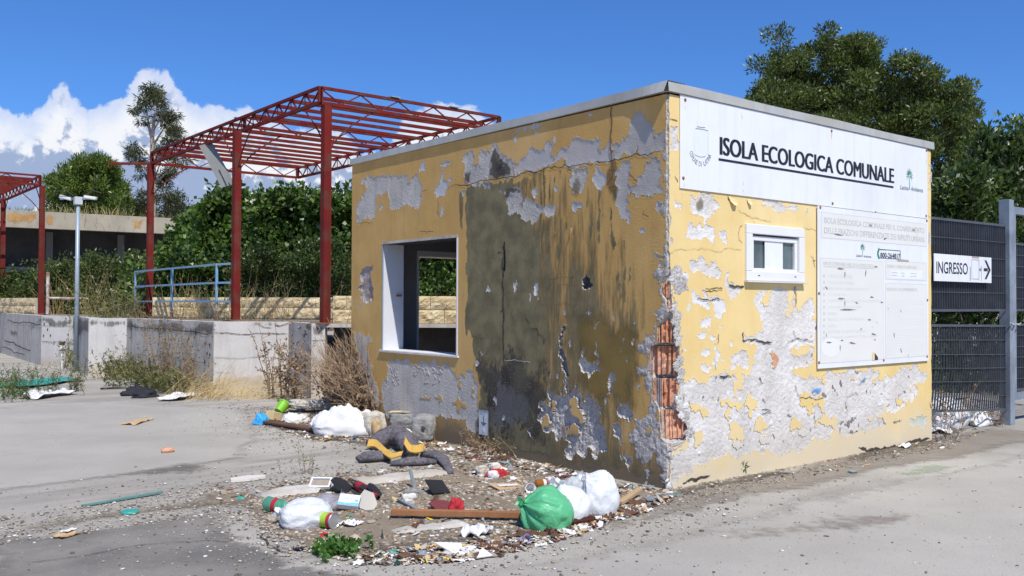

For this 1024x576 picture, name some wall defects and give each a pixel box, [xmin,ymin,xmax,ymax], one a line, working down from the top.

crack [420,105,664,233]
leakage [573,179,625,249]
crack [472,243,544,378]
peeling [350,97,927,497]